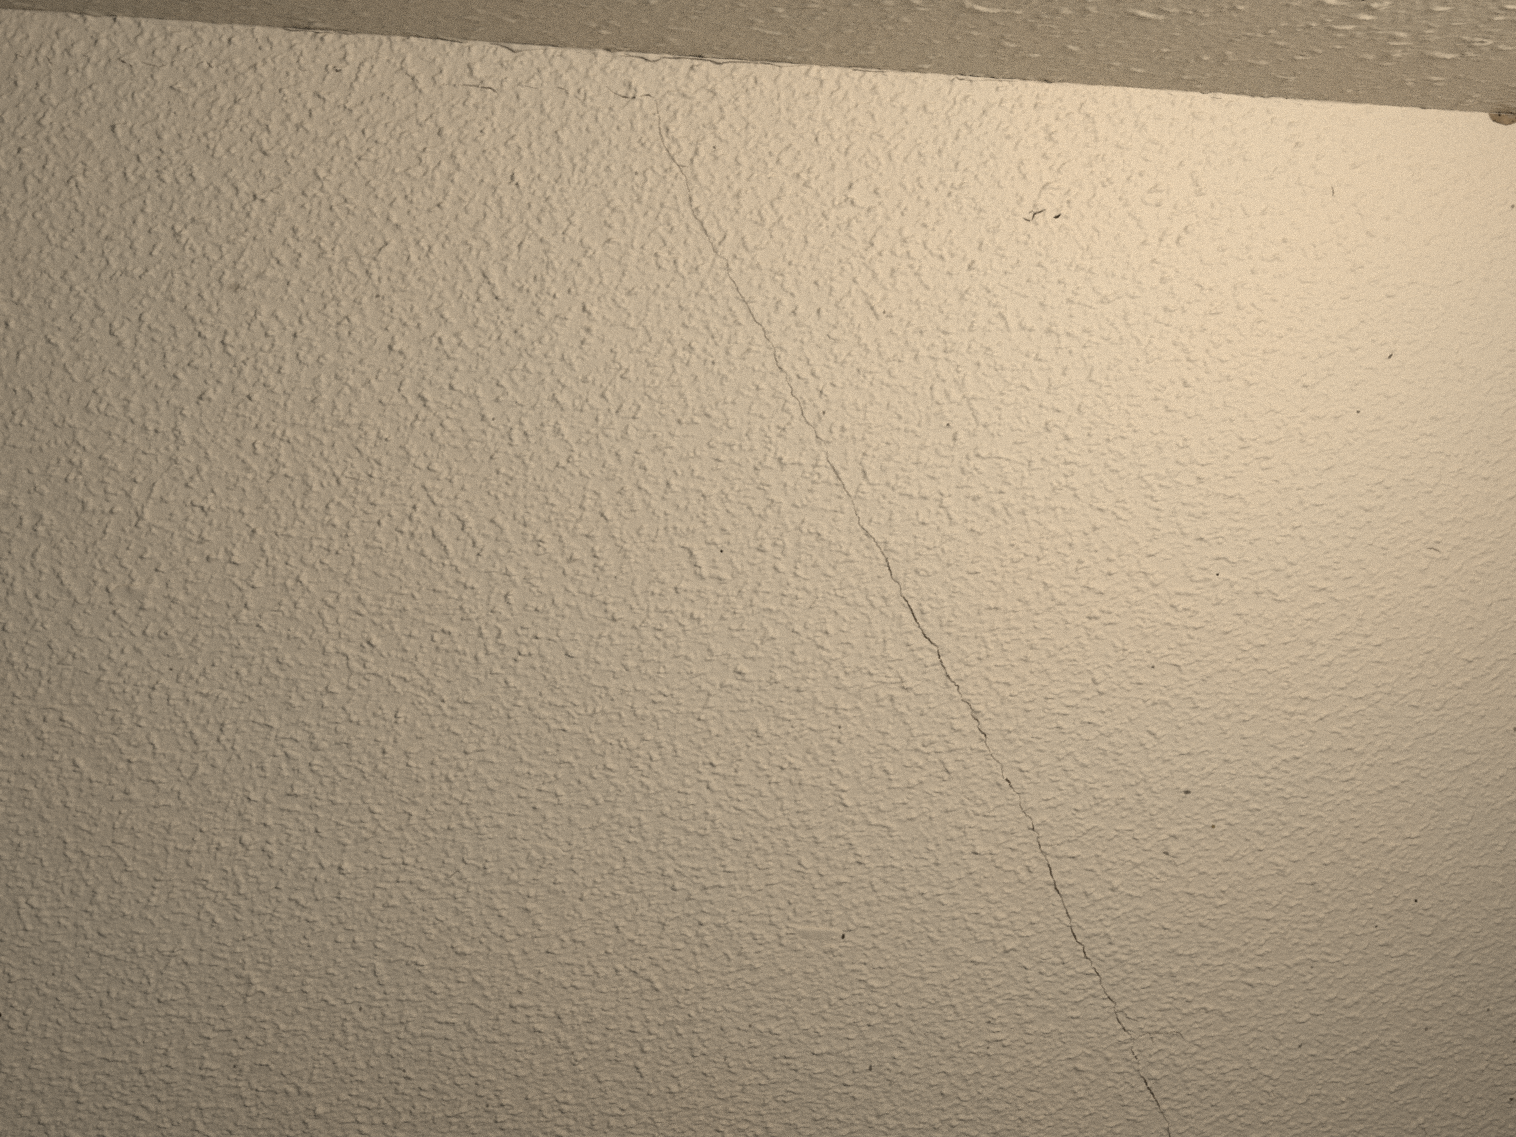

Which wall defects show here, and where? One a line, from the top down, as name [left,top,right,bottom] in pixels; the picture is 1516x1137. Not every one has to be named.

crack [888,563,986,737]
crack [1032,824,1170,1137]